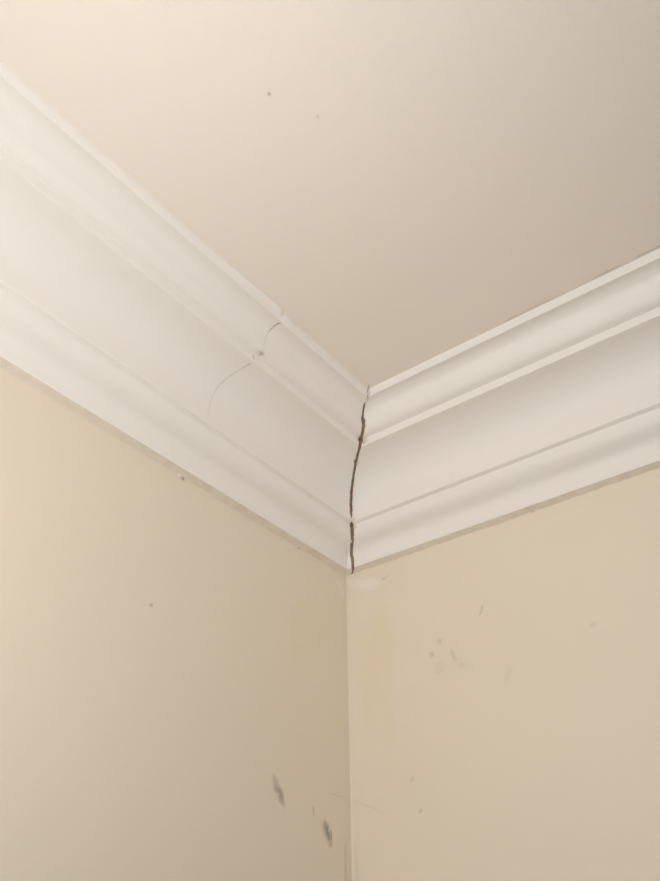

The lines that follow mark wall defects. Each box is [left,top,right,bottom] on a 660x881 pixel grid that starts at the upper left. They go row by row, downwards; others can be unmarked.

crack [349,383,371,574]